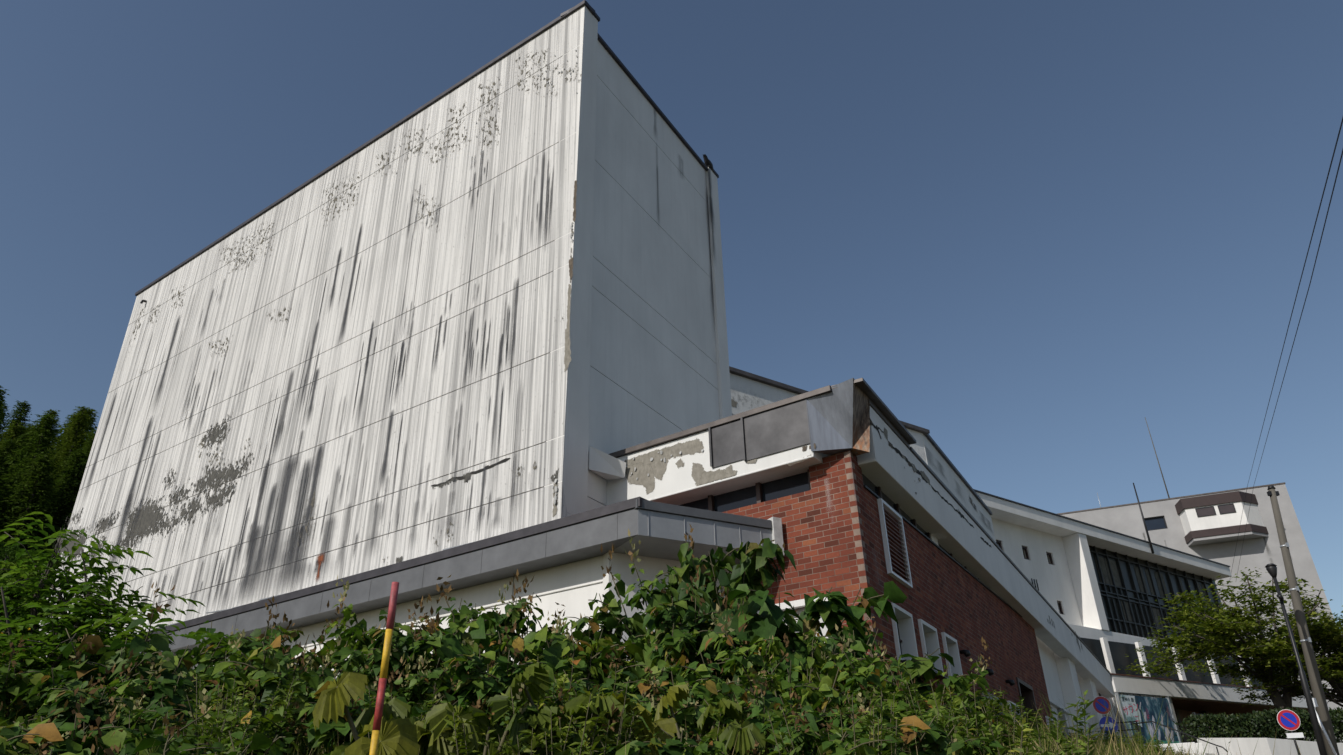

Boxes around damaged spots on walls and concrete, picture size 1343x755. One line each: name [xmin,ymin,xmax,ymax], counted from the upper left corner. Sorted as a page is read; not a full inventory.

damp [527,157,553,235]
damp [385,142,448,397]
damp [450,128,522,492]
damp [354,324,376,409]
damp [82,286,221,580]
damp [189,228,361,602]
damp [382,413,409,499]
damp [468,468,490,520]
crack [431,458,537,489]
peeling [625,439,757,494]
crack [868,418,992,548]